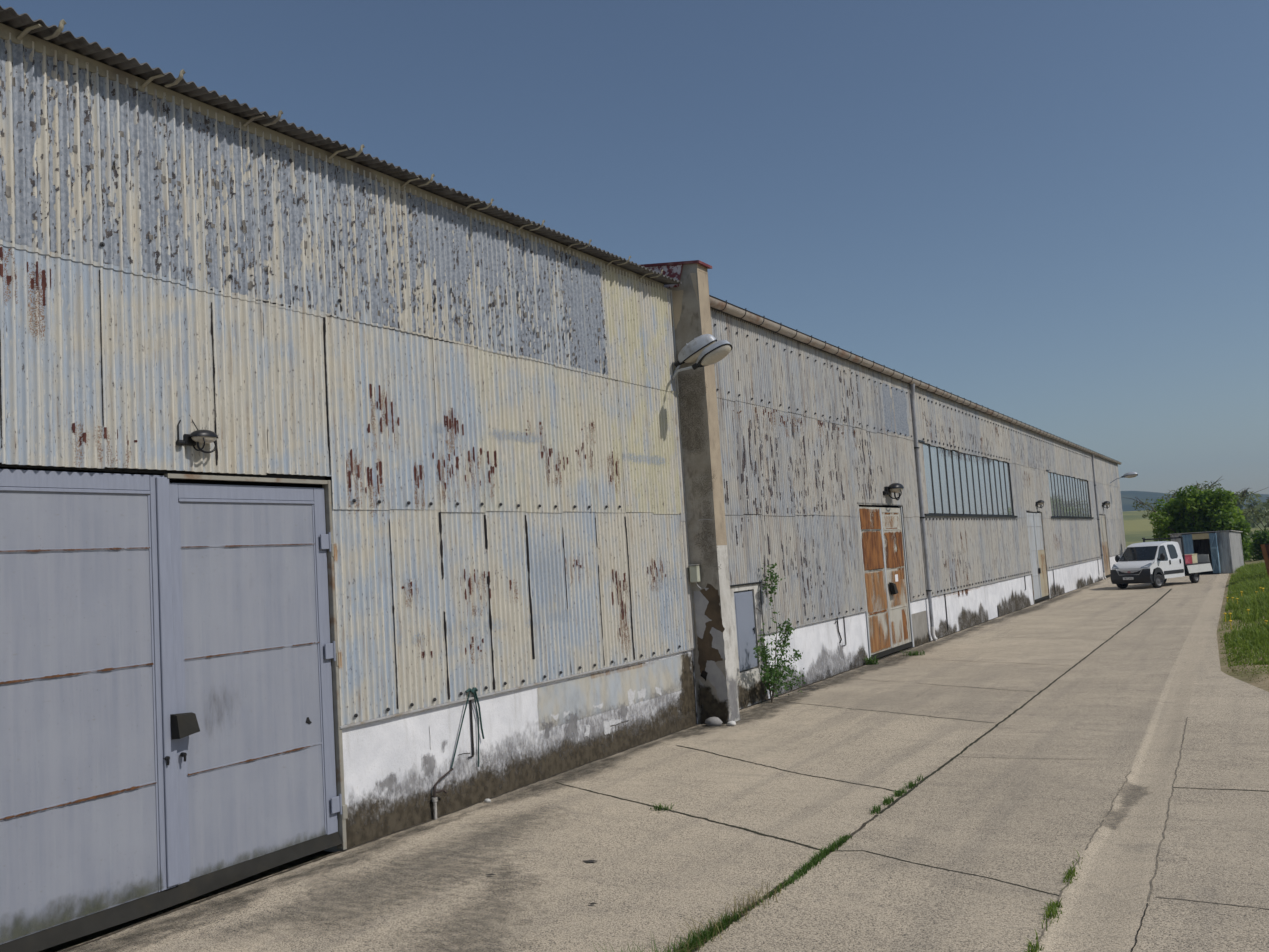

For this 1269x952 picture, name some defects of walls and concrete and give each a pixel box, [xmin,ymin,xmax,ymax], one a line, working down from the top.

peeling [0,38,608,375]
rust [0,247,51,342]
rust [346,384,399,518]
rust [414,408,497,512]
rust [525,420,620,494]
rust [612,569,632,654]
peeling [538,584,729,737]
water stain [279,576,1103,880]
rust [859,508,908,653]
water stain [81,890,261,952]
crack [1033,771,1131,951]
crack [1131,717,1188,952]